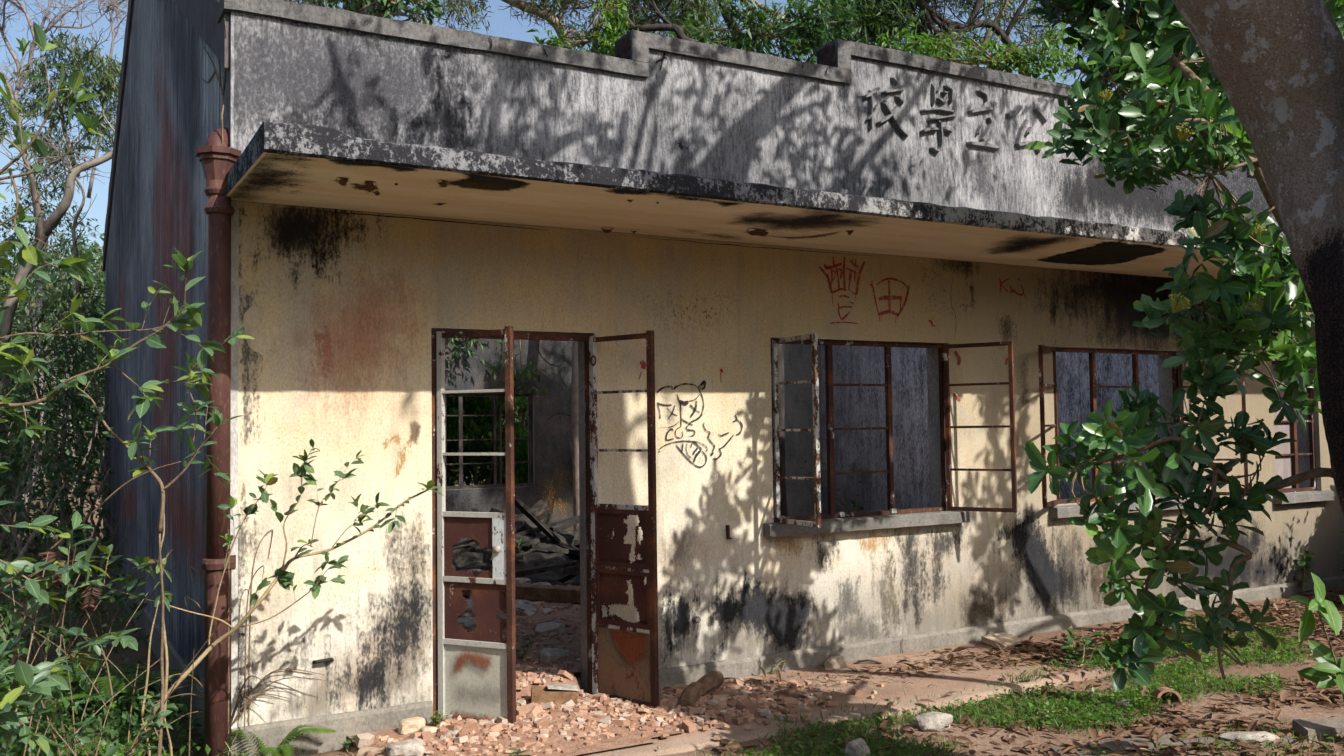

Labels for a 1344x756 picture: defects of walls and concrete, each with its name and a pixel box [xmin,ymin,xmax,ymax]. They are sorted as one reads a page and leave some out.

water stain [165,0,485,246]
spalling [333,177,380,196]
water stain [451,173,529,191]
water stain [606,188,869,239]
spalling [745,228,770,237]
flaking render [1038,242,1168,266]
water stain [238,246,262,443]
corrosion [383,421,420,475]
water stain [358,538,431,701]
water stain [660,568,814,665]
water stain [860,524,962,624]
water stain [1005,509,1127,613]